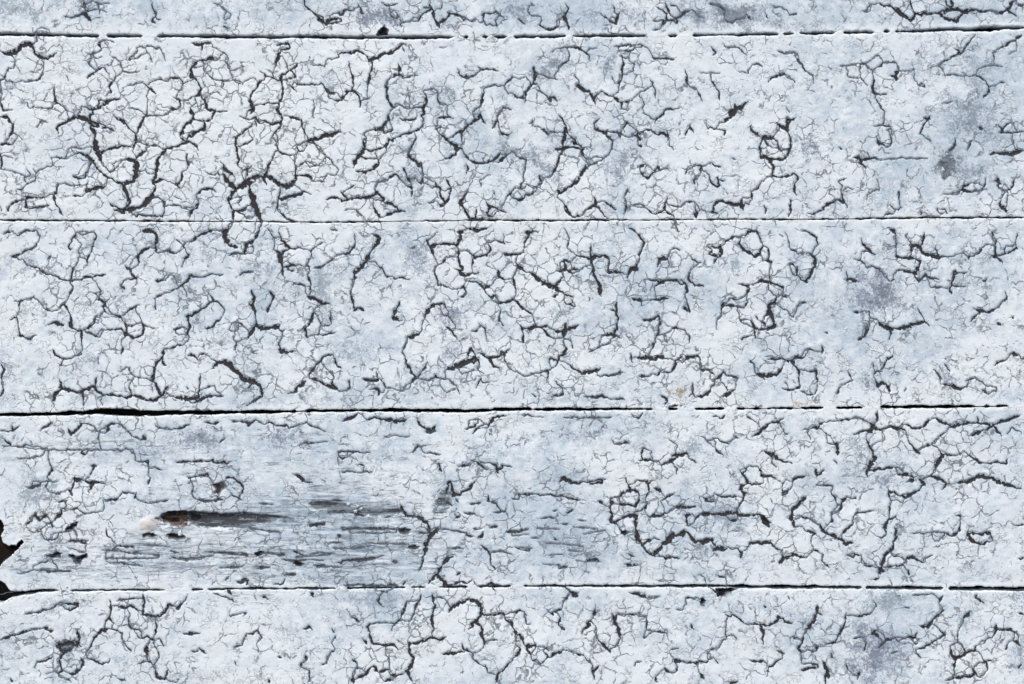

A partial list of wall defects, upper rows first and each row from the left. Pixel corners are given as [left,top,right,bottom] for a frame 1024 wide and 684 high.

crack [863,0,1024,24]
crack [839,34,1024,168]
crack [0,0,880,553]
crack [853,308,929,392]
crack [846,177,1018,294]
crack [933,352,1024,395]
crack [971,292,1014,325]
crack [0,559,72,595]
peeling [142,510,299,541]
peeling [308,500,403,518]
crack [102,410,1024,684]
crack [1,594,206,683]